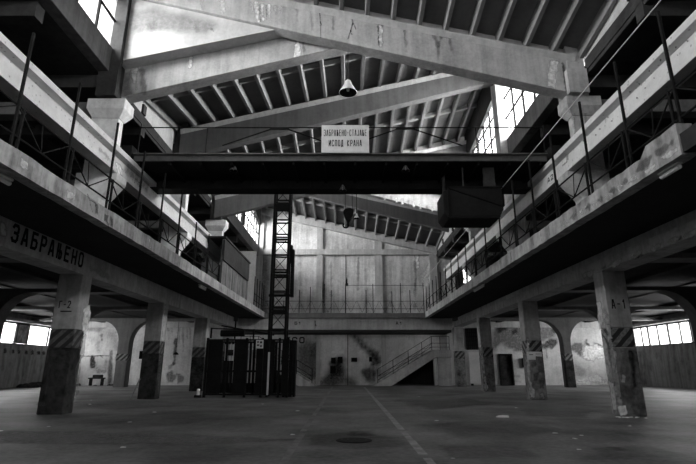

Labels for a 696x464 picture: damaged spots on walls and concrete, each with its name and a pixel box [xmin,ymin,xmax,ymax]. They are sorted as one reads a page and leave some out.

peeling [167,338,183,382]
peeling [492,328,544,398]
peeling [540,328,557,349]
spalling [571,302,627,416]